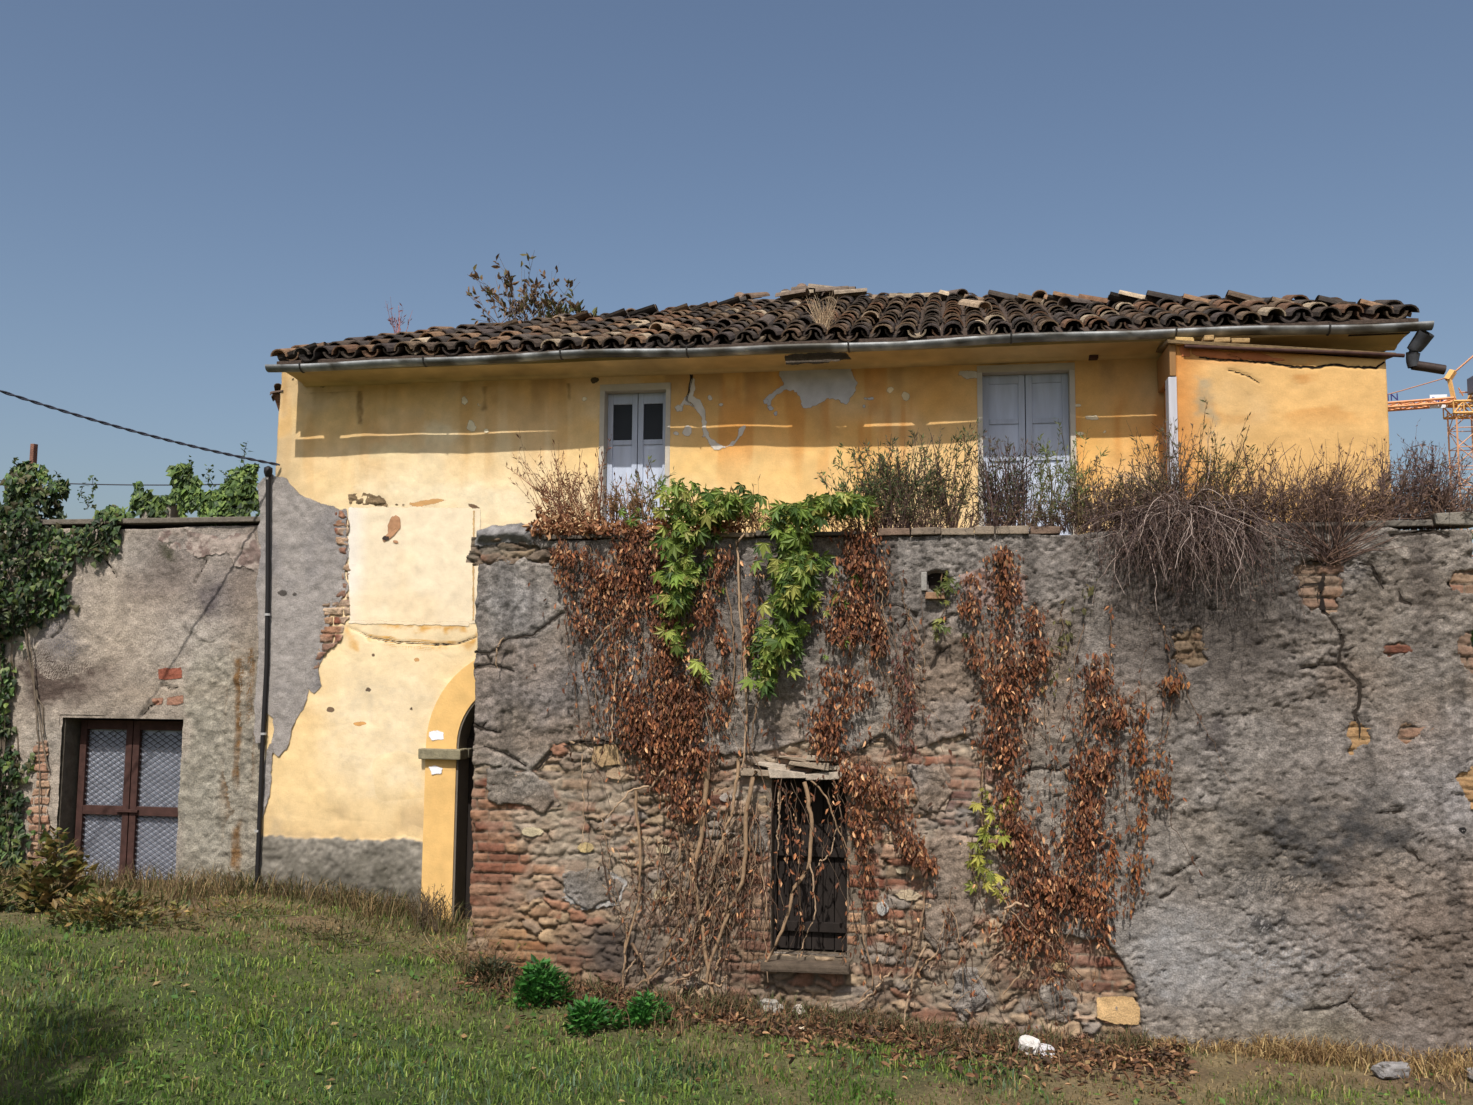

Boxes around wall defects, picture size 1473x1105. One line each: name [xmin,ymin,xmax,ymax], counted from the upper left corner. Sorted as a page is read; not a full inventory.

peeling [673,378,746,450]
crack [1199,356,1385,382]
peeling [158,396,558,828]
crack [351,511,563,672]
crack [1298,529,1450,738]
spalling [466,730,1142,1044]